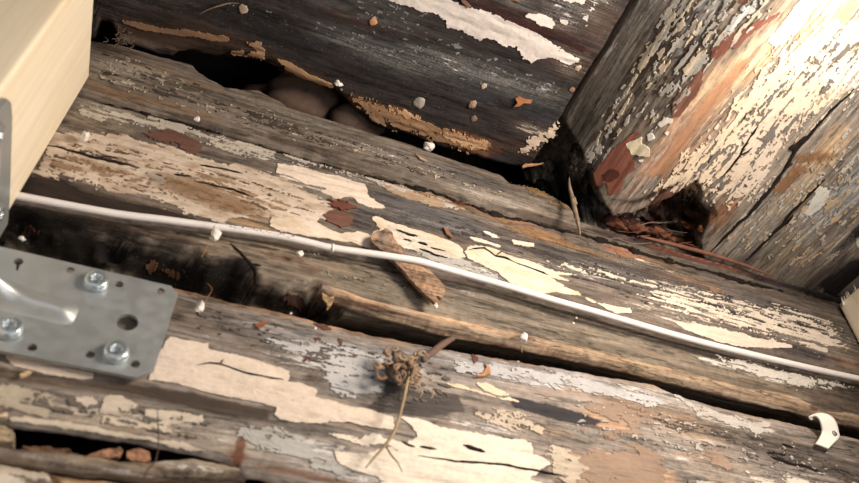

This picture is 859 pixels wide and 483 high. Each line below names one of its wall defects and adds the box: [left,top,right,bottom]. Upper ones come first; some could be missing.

peeling [100,57,233,118]
peeling [32,104,848,357]
peeling [357,0,579,80]
peeling [477,57,558,93]
crack [364,88,854,293]
peeling [582,0,773,164]
peeling [644,0,859,267]
peeling [6,346,93,380]
crack [402,441,566,476]
peeling [149,337,854,483]